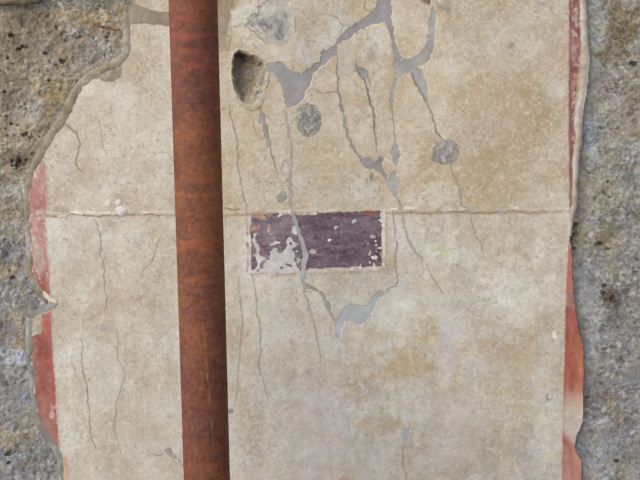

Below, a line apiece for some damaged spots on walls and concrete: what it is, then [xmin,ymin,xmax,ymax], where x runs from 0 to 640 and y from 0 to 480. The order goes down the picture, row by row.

crack [241,0,267,44]
crack [224,106,247,231]
crack [252,0,561,361]
peeling [248,224,301,274]
peeling [365,235,382,271]
spalling [30,291,57,336]
crack [228,274,267,413]